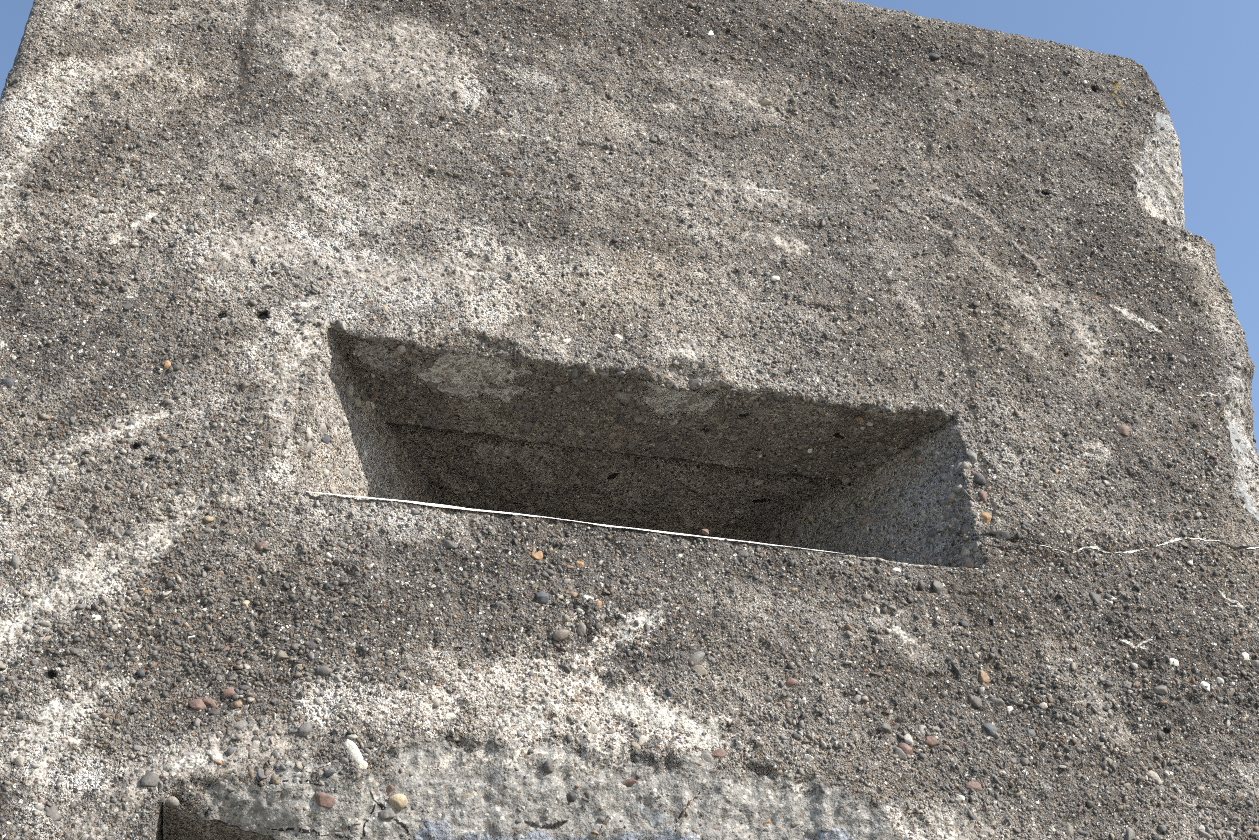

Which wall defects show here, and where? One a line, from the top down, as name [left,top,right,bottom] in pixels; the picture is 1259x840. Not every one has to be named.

crack [935,530,1259,554]
spalling [0,515,103,626]
spalling [42,717,88,794]
crack [258,764,337,789]
spalling [80,794,148,840]
crack [267,780,412,840]
crack [675,790,701,832]
spalling [1047,796,1092,840]